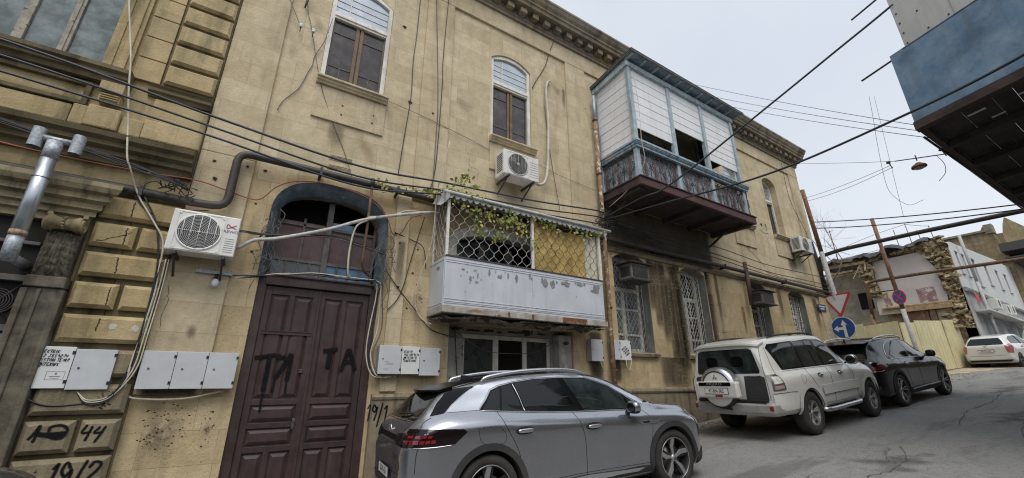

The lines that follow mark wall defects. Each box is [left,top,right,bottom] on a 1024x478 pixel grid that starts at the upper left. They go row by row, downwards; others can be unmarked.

crack [95,202,136,331]
peeling [461,268,600,298]
leakage [648,261,691,384]